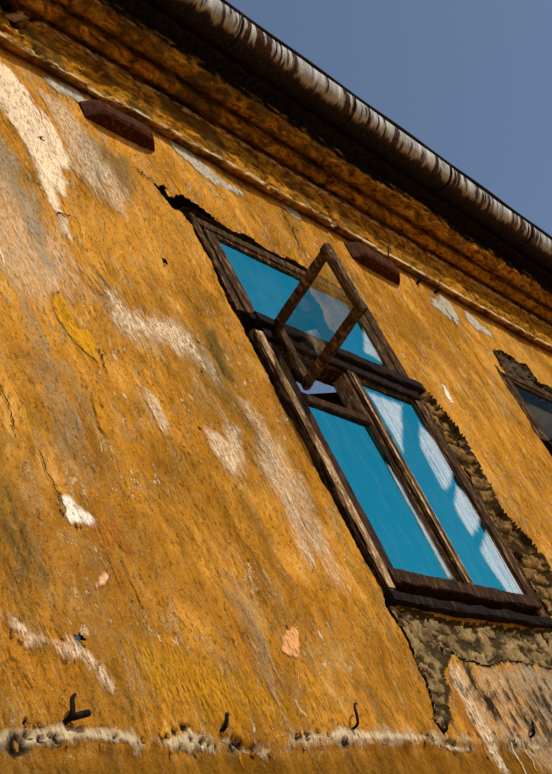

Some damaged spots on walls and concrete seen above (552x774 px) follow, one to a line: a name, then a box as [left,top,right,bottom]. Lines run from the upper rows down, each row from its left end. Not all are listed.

flaking render [44,77,84,102]
flaking render [0,63,72,240]
flaking render [420,384,552,613]
flaking render [282,623,300,657]
flaking render [288,604,552,774]
flaking render [0,716,146,756]
flaking render [159,724,272,758]